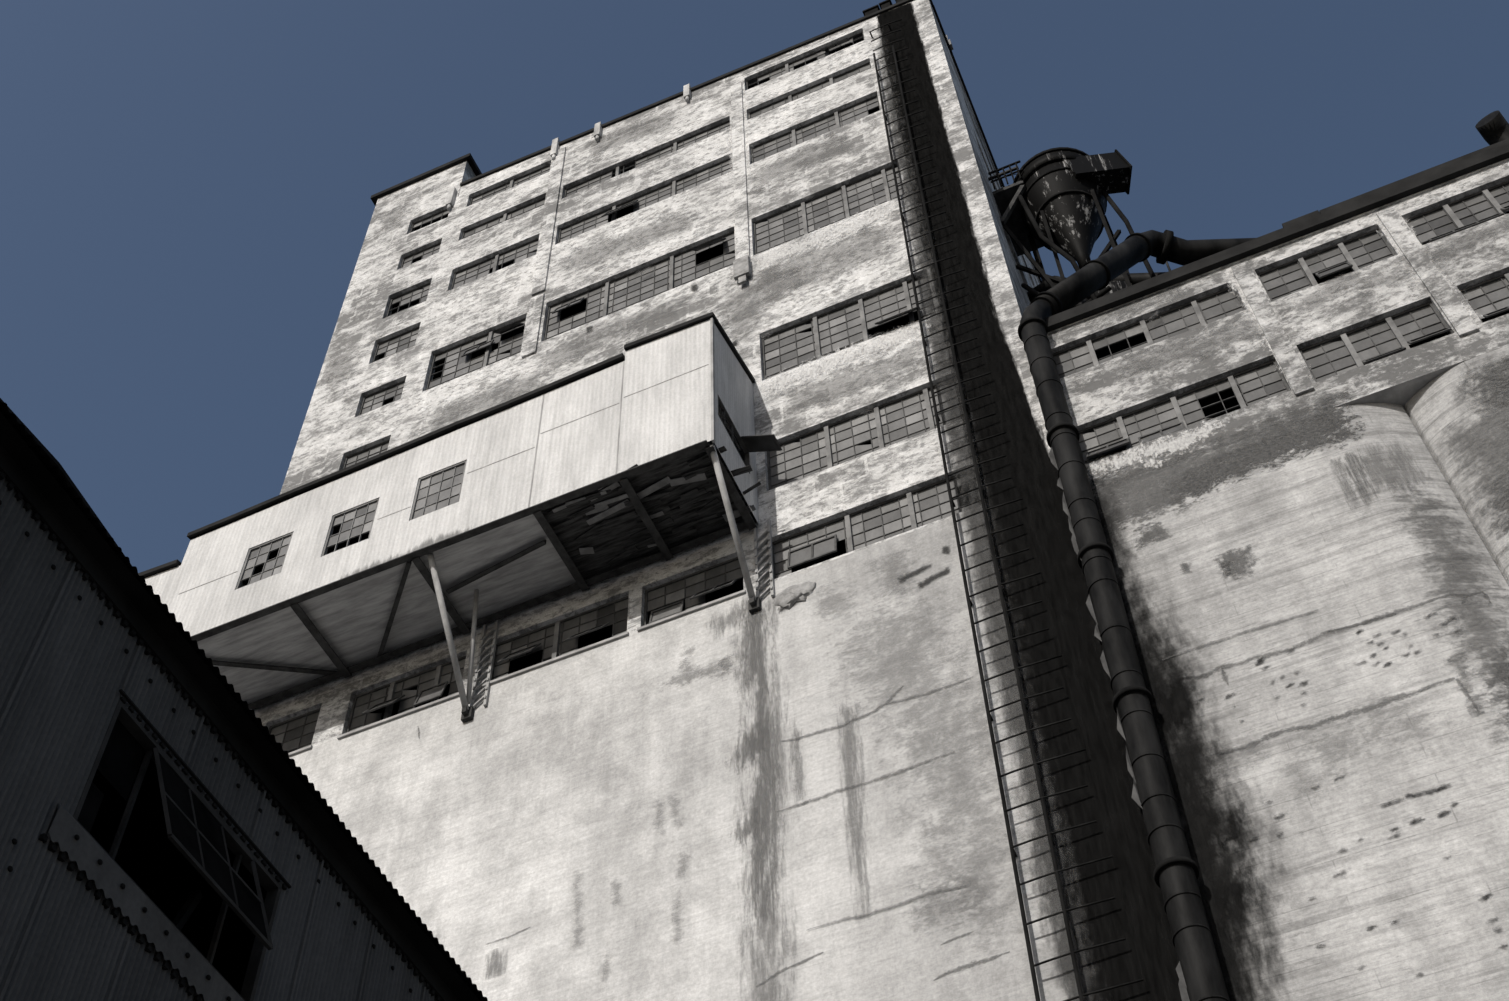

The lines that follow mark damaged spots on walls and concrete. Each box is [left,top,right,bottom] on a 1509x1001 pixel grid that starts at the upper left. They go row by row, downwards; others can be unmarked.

water stain [1091,421,1224,471]
water stain [1449,356,1509,531]
water stain [1345,452,1509,724]
crack [1163,591,1490,684]
crack [782,678,969,741]
crack [1221,678,1479,755]
water stain [719,602,802,1001]
water stain [842,713,861,868]
crack [777,751,955,812]